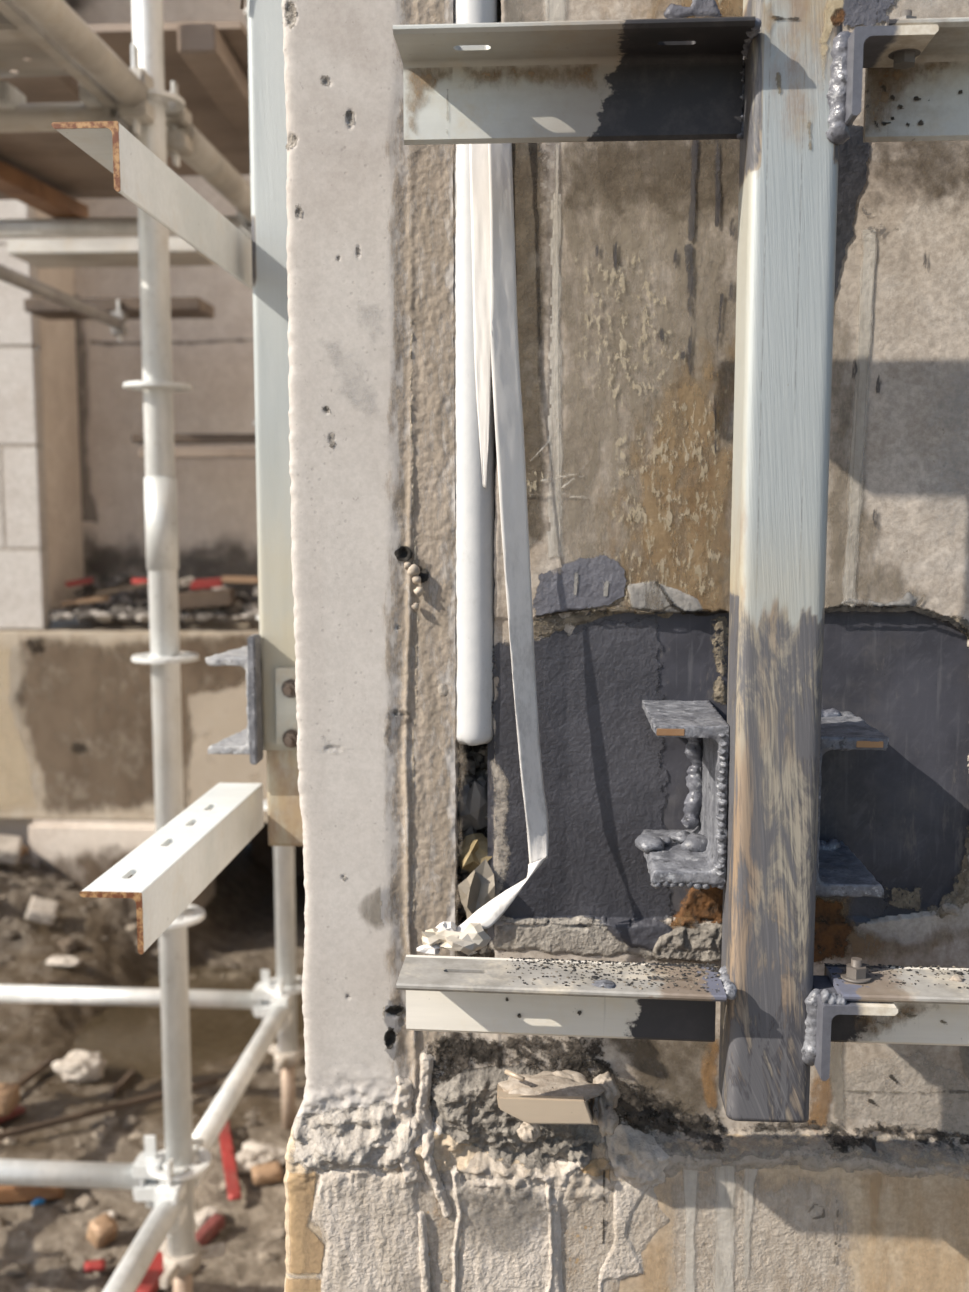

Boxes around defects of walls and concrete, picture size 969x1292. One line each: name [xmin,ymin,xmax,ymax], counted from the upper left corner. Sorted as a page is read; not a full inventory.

leakage [507,0,522,22]
leakage [544,0,566,21]
leakage [512,139,740,558]
leakage [17,637,155,811]
leakage [179,634,268,815]
peeling [491,761,509,897]
corrosion [671,885,723,929]
corrosion [814,898,905,962]
corrosion [886,887,923,912]